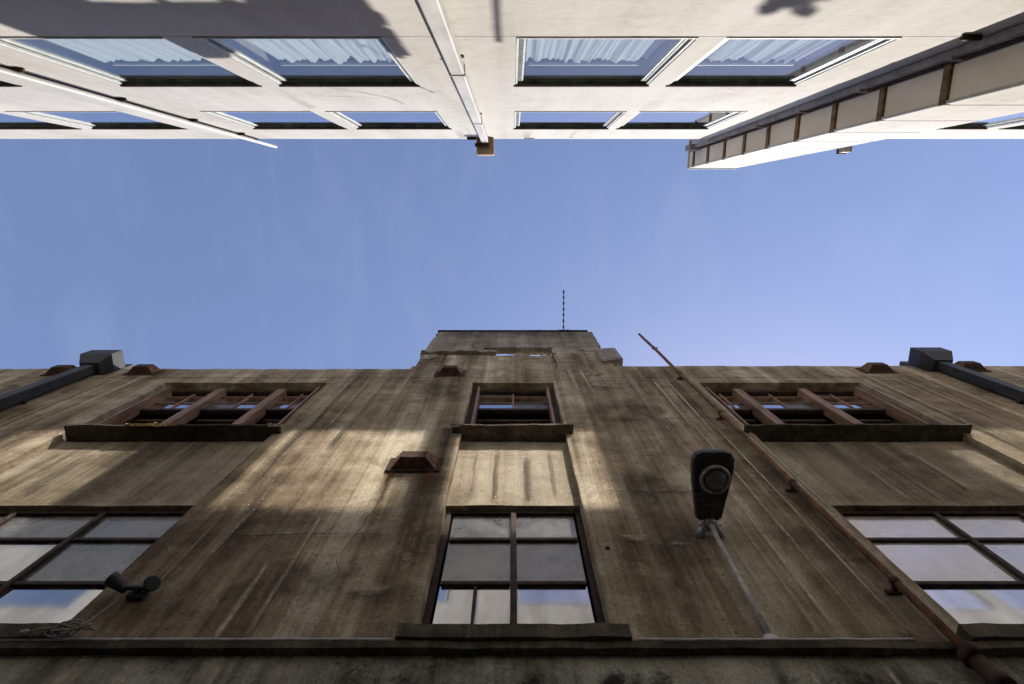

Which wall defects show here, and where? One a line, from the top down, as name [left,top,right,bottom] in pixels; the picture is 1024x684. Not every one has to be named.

crack [185,482,387,584]